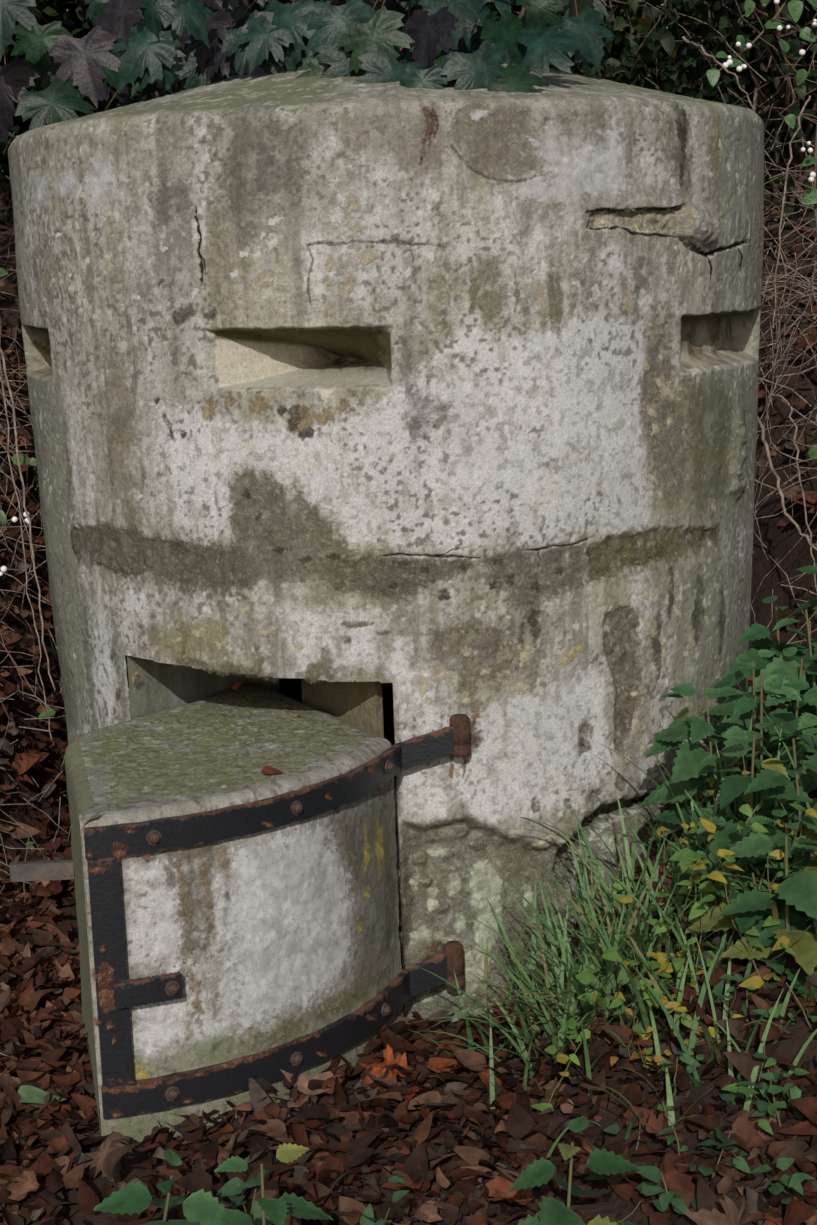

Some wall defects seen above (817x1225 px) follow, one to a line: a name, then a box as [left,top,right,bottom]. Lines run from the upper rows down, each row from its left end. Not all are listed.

crack [194,211,206,285]
crack [307,239,439,304]
crack [586,204,751,280]
crack [383,548,480,559]
crack [524,538,588,570]
rust [449,710,482,778]